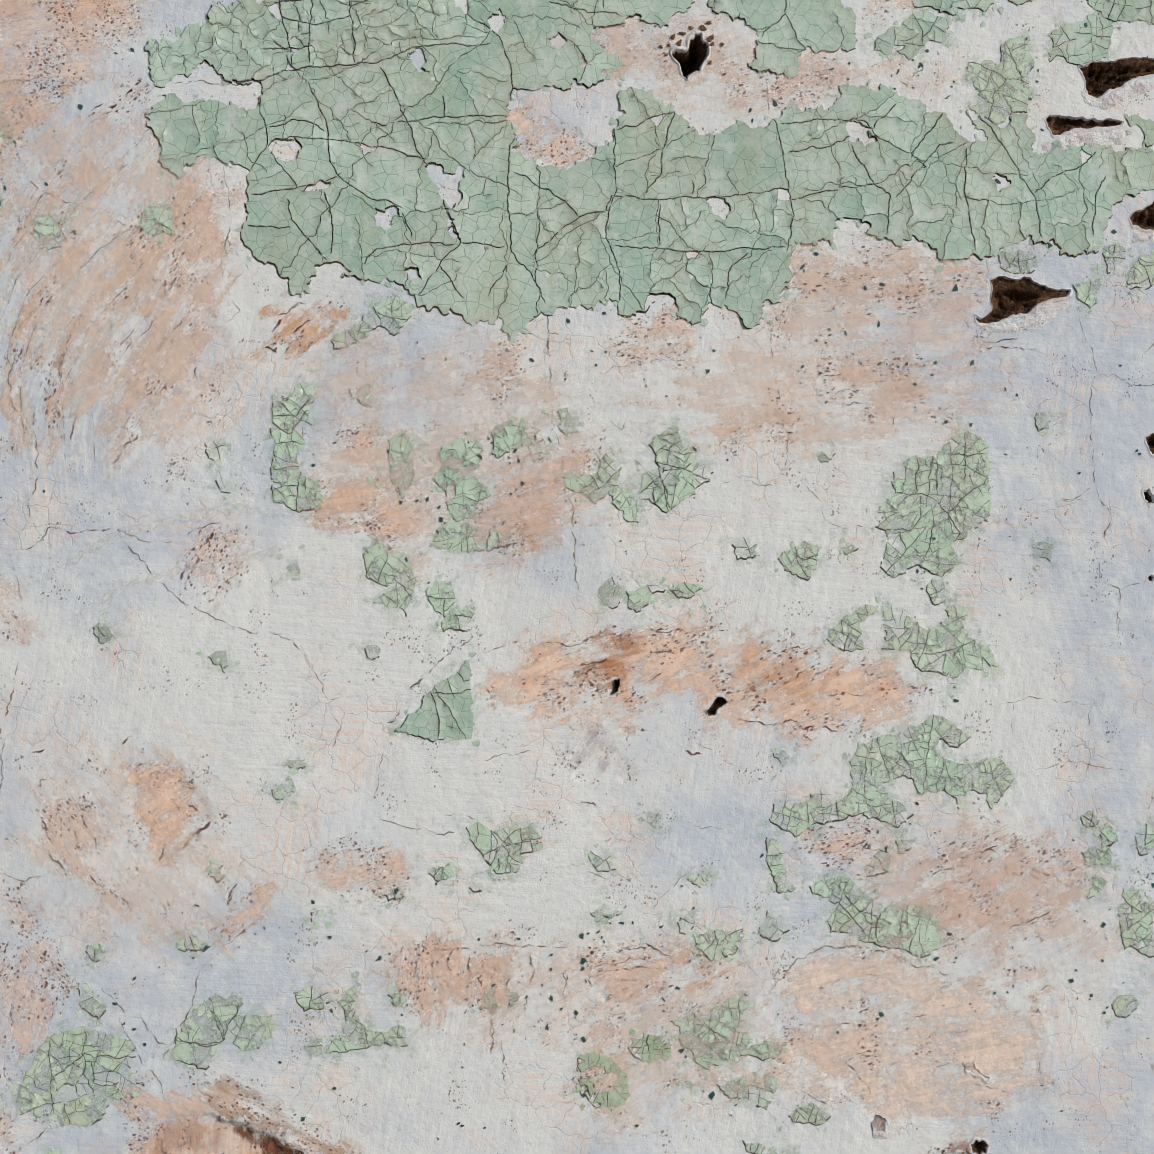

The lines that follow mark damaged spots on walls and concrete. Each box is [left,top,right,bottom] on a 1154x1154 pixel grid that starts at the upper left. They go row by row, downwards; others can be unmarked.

peeling [145,0,1154,358]
peeling [34,203,79,258]
peeling [136,201,179,244]
peeling [205,442,239,507]
peeling [263,369,324,527]
peeling [563,426,714,523]
peeling [1078,808,1121,904]
peeling [1135,822,1154,861]
peeling [1110,881,1154,958]
peeling [2,936,149,1128]
peeling [1107,994,1139,1024]
spalling [134,1106,309,1154]